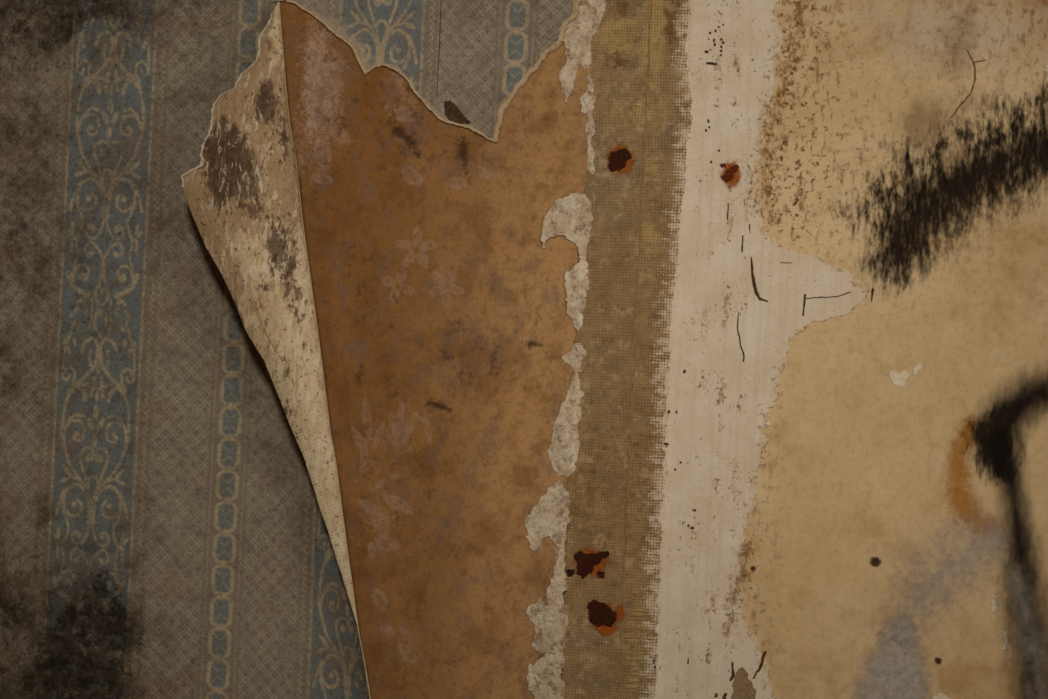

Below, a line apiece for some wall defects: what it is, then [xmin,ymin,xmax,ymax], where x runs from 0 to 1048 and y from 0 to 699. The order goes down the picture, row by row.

peeling [444,100,471,124]
corrosion [607,144,634,172]
corrosion [720,163,740,188]
peeling [181,2,371,699]
corrosion [566,549,609,579]
corrosion [587,600,624,635]
mould [25,572,141,699]
spalling [714,651,767,699]